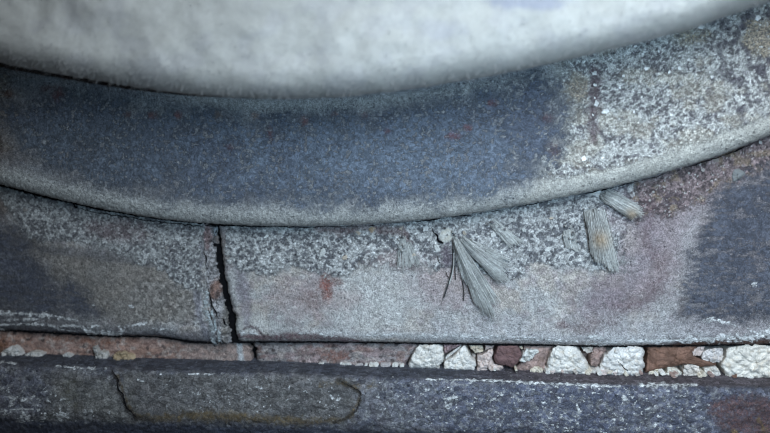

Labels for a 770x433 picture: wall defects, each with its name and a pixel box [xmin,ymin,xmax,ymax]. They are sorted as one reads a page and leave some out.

crack [0,140,770,371]